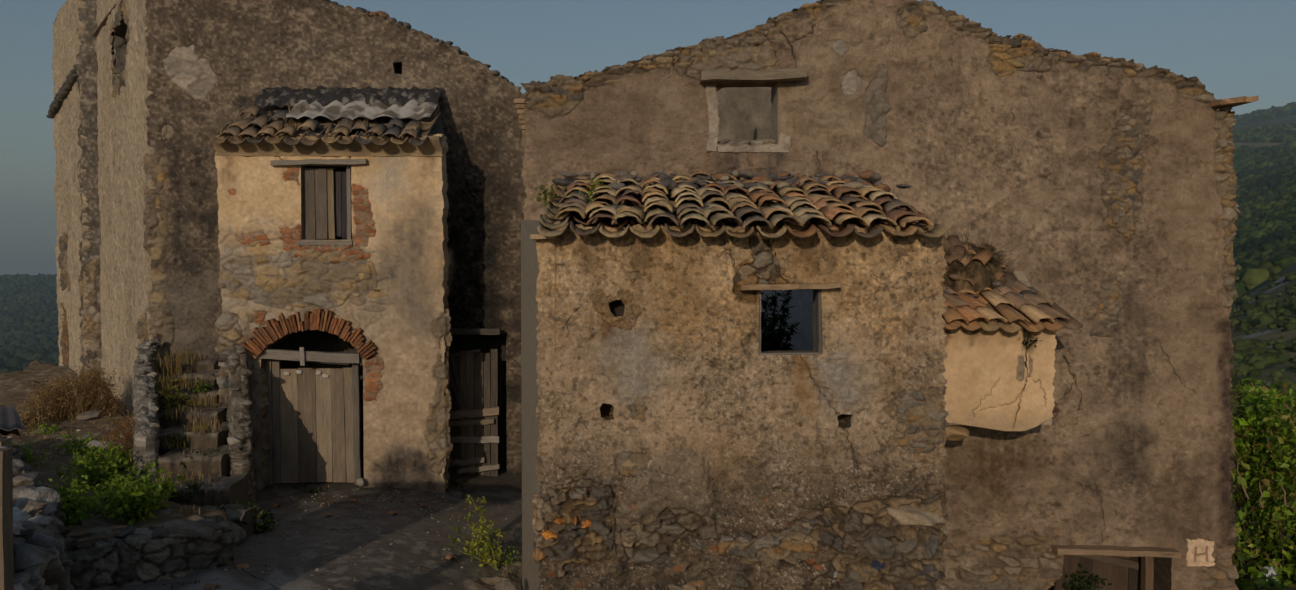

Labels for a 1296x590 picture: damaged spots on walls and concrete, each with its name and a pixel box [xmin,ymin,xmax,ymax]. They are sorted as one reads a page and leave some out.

spalling [214,184,381,408]
spalling [734,236,793,303]
crack [800,354,859,476]
crack [973,331,1086,429]